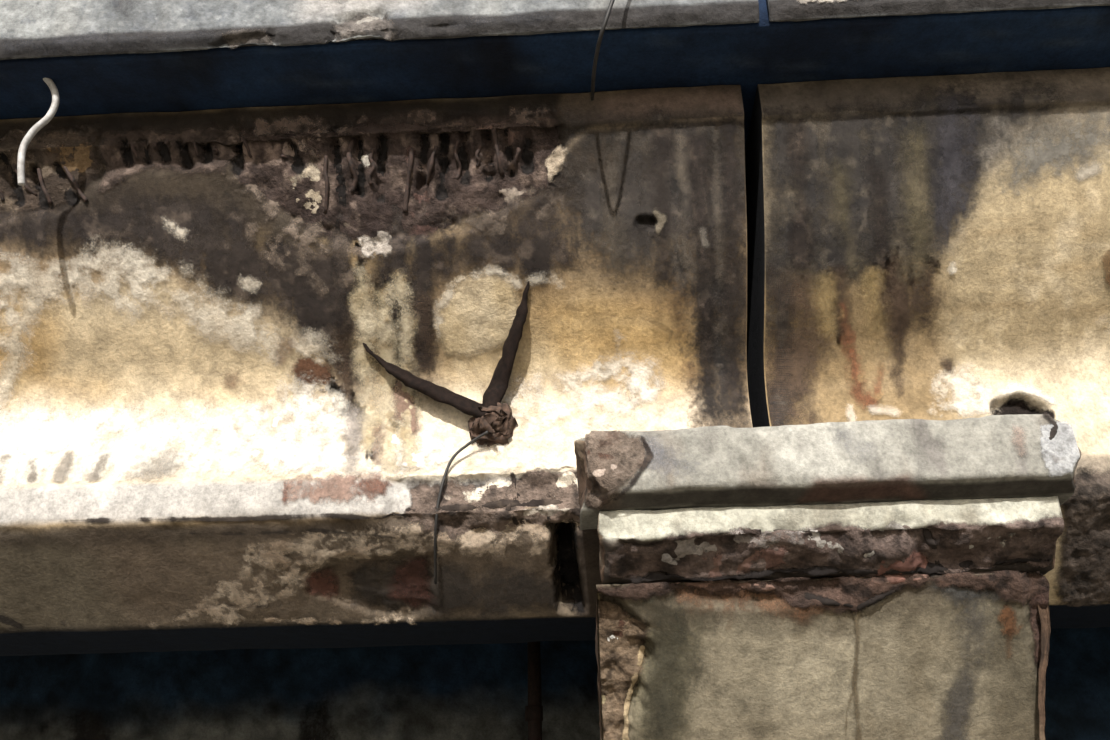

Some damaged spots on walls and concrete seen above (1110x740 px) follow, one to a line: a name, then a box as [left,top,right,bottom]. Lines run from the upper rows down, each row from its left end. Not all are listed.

spalling [0,106,567,334]
water stain [0,110,748,486]
water stain [763,80,1110,426]
spalling [177,430,653,625]
spalling [597,412,1110,740]